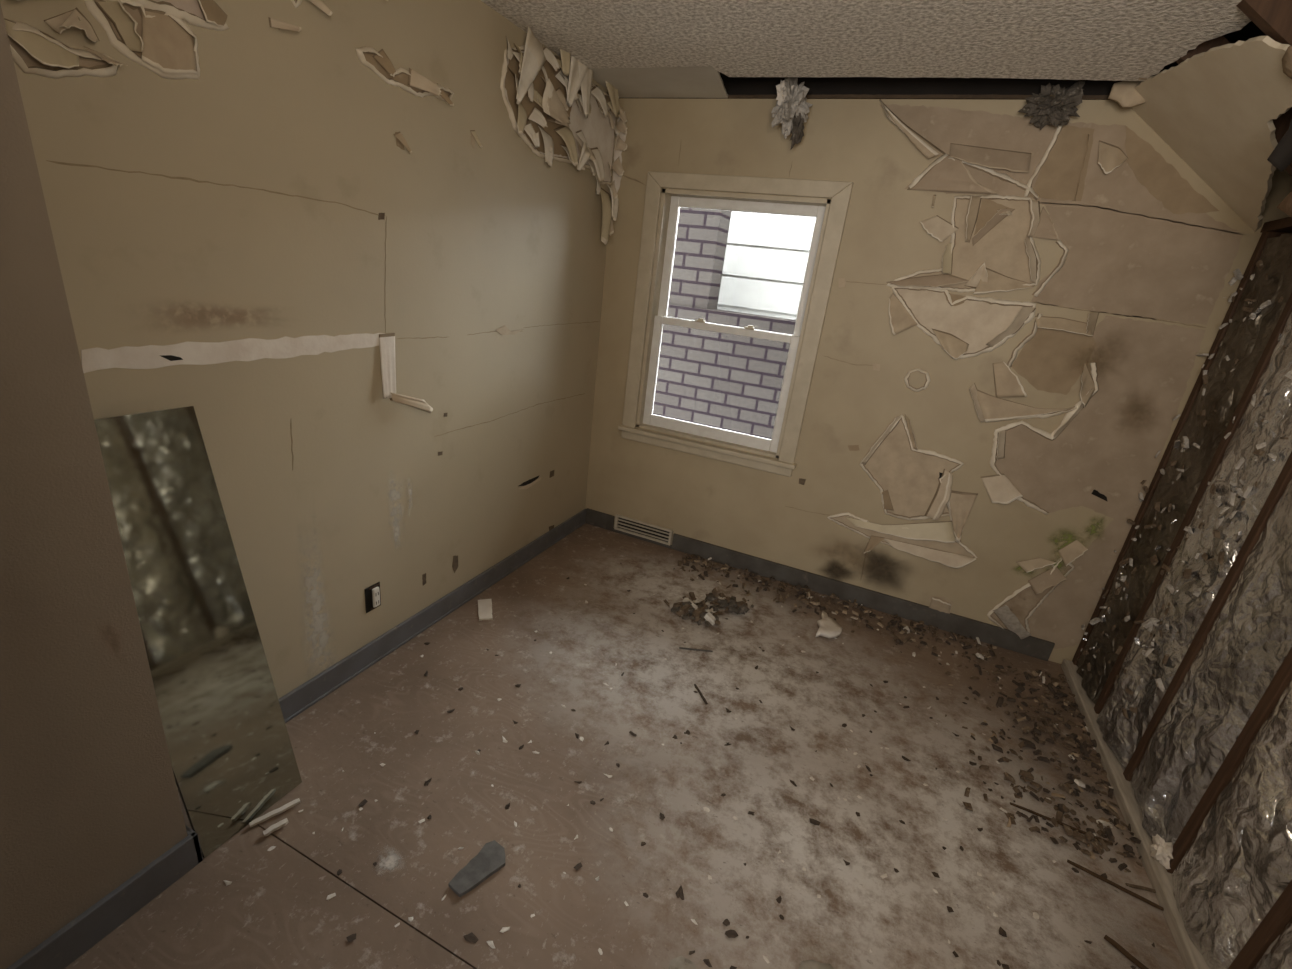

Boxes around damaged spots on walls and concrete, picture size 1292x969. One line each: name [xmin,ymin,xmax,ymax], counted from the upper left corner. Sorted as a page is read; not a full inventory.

peeling [4,0,229,80]
peeling [355,47,454,106]
peeling [500,26,628,245]
peeling [879,99,1243,649]
peeling [827,513,978,569]